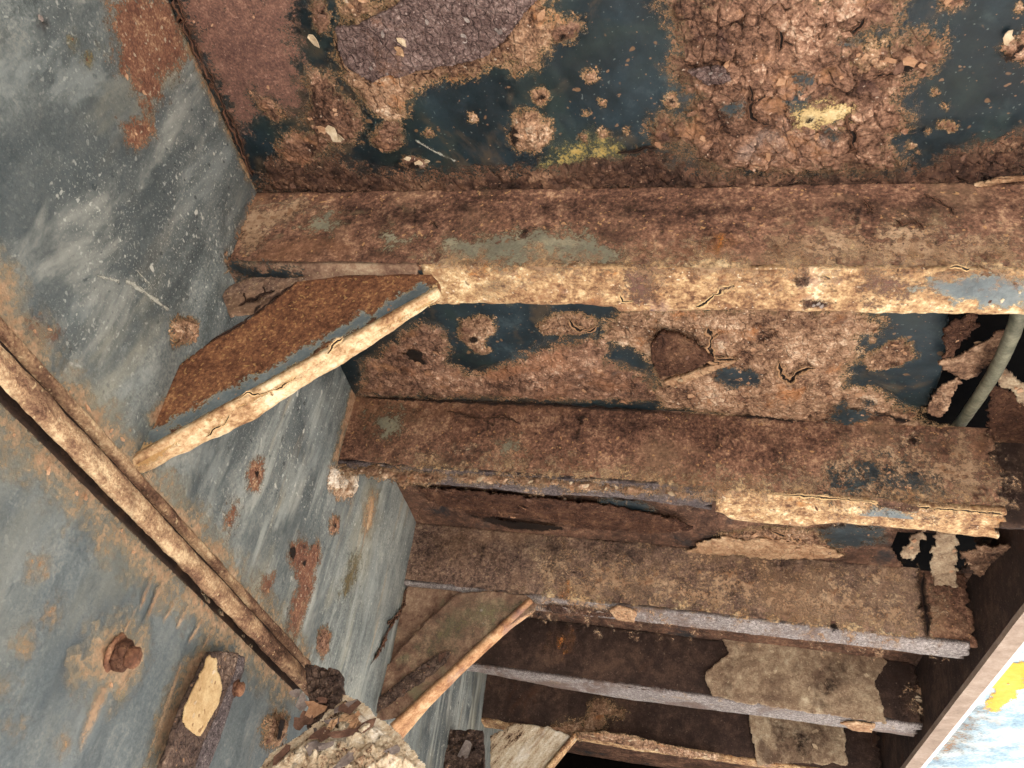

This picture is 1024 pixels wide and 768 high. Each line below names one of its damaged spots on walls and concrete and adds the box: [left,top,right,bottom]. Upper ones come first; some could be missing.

peeling [381,30,406,57]
crack [769,21,794,52]
crack [818,13,866,40]
crack [745,85,771,128]
spalling [639,0,956,179]
crack [873,72,899,80]
corrosion [67,0,1024,274]
spalling [401,154,430,171]
peeling [974,175,1024,187]
crack [208,284,294,344]
corrosion [0,199,1024,668]
corrosion [0,403,301,768]